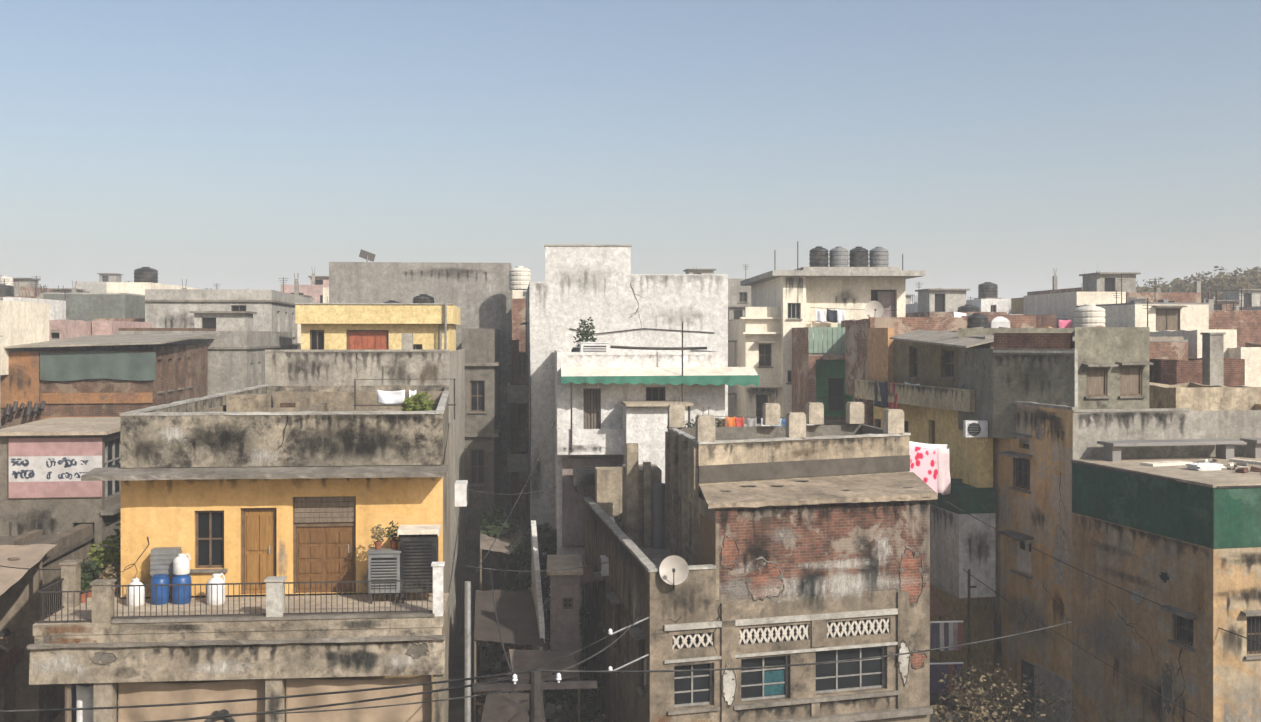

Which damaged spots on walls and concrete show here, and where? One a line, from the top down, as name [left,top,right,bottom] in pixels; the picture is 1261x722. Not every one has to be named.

damp [163,428,275,462]
damp [300,415,434,454]
flaking render [720,534,785,601]
flaking render [896,546,924,605]